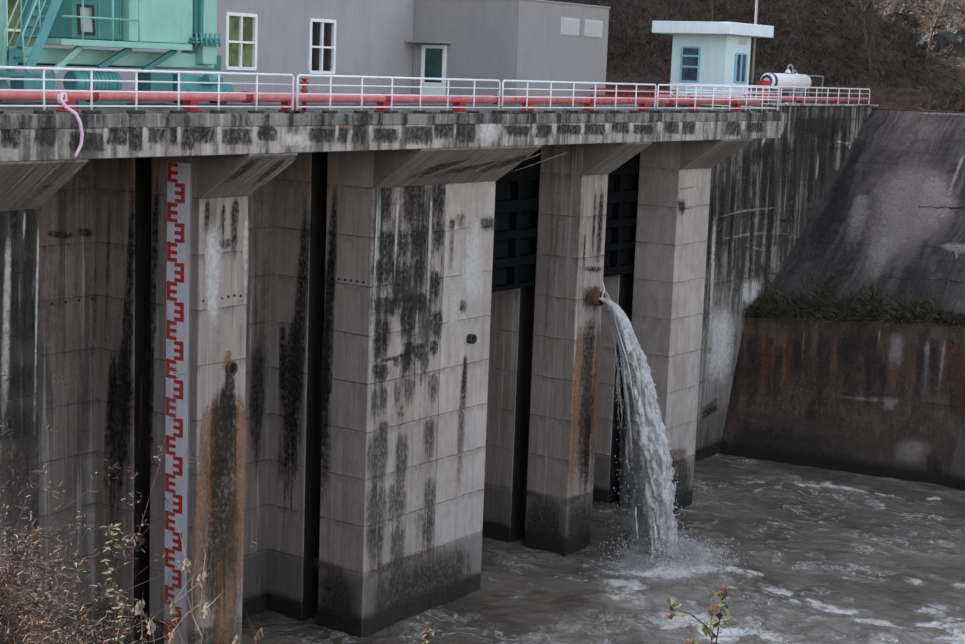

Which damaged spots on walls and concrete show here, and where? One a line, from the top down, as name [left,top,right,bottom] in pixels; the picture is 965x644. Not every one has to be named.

leakage [1,129,20,148]
leakage [104,184,159,511]
rust [191,351,246,644]
leakage [278,201,310,508]
leakage [317,559,356,635]
leakage [367,419,471,627]
leakage [458,358,467,460]
leakage [35,108,965,411]
rust [568,320,600,490]
crack [918,203,965,211]